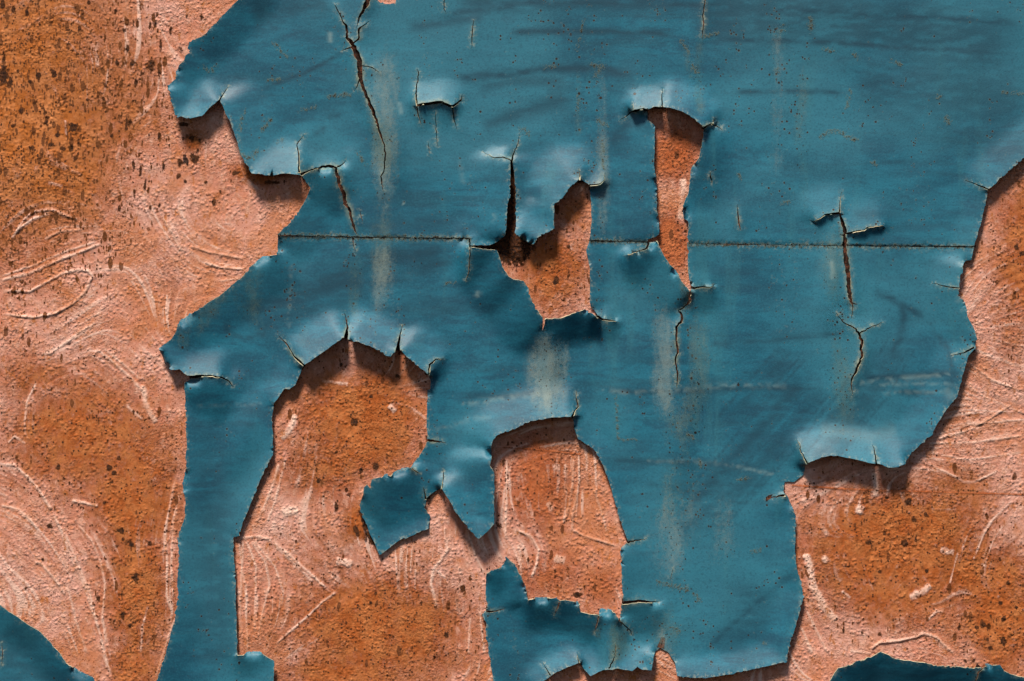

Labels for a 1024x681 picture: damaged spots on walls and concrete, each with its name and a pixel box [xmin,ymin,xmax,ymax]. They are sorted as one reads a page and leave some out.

rust [0,0,206,681]
peeling [0,0,346,681]
rust [212,164,285,205]
crack [297,136,363,249]
crack [335,0,386,192]
crack [411,71,463,147]
peeling [217,121,1024,681]
peeling [621,82,732,312]
crack [675,285,719,386]
crack [799,186,892,394]
rust [241,348,622,681]
rust [784,455,1024,673]